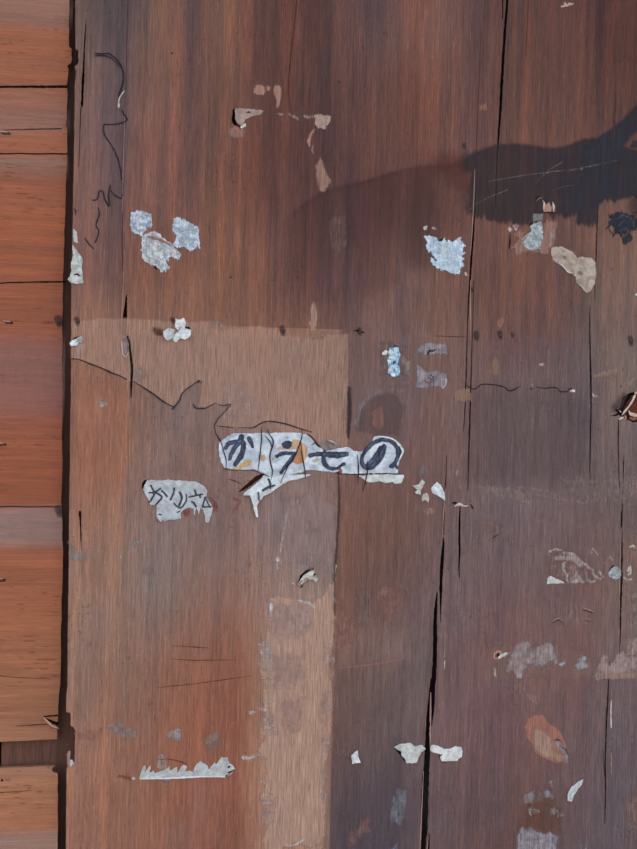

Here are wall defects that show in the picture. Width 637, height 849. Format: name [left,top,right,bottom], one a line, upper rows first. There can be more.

crack [497,0,529,146]
damp [466,107,637,227]
peeling [130,210,200,272]
peeling [423,225,468,276]
crack [592,209,600,284]
crack [443,174,592,476]
spalling [612,392,637,422]
crack [420,456,461,849]